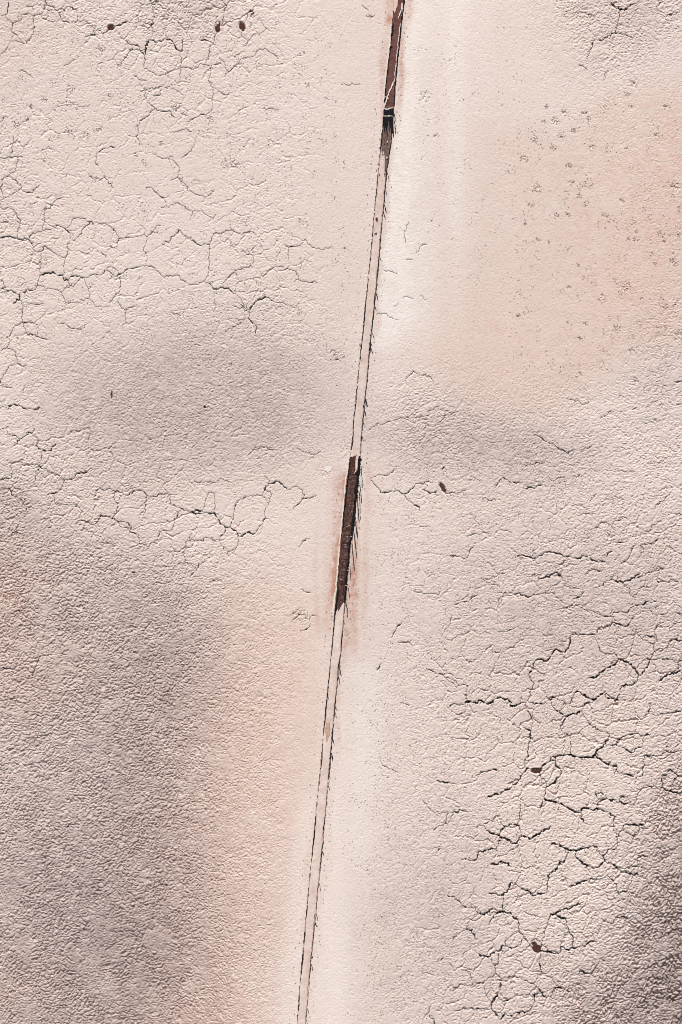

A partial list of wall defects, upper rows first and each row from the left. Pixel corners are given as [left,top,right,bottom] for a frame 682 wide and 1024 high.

crack [0,0,332,582]
corrosion [310,447,392,674]
corrosion [376,0,420,147]
crack [371,435,682,1024]